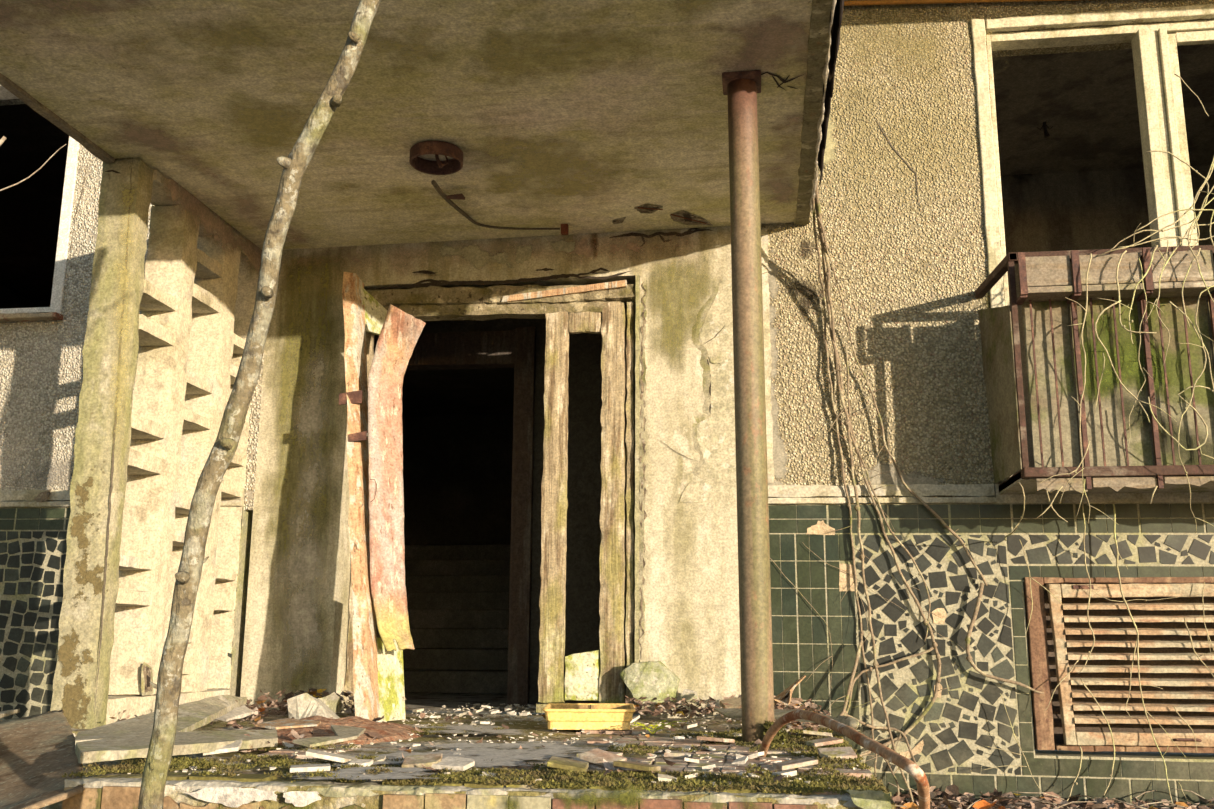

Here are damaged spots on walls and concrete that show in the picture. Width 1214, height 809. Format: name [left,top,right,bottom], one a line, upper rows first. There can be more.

crack [376,228,713,289]